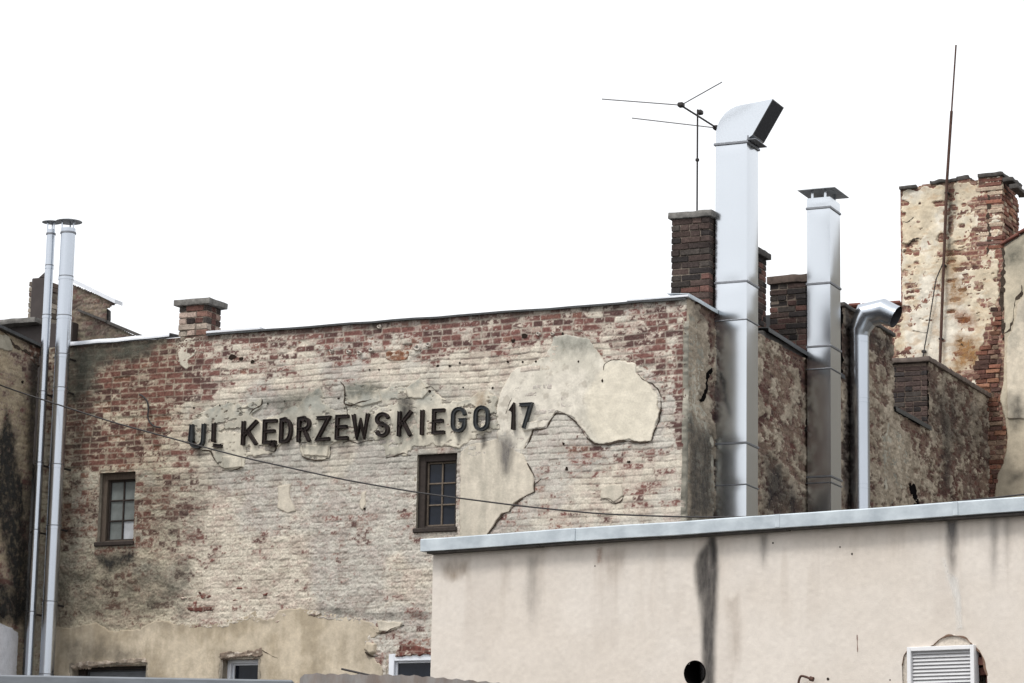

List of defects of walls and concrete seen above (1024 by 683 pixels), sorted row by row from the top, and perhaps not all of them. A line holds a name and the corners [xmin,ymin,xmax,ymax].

peeling [191,334,660,536]